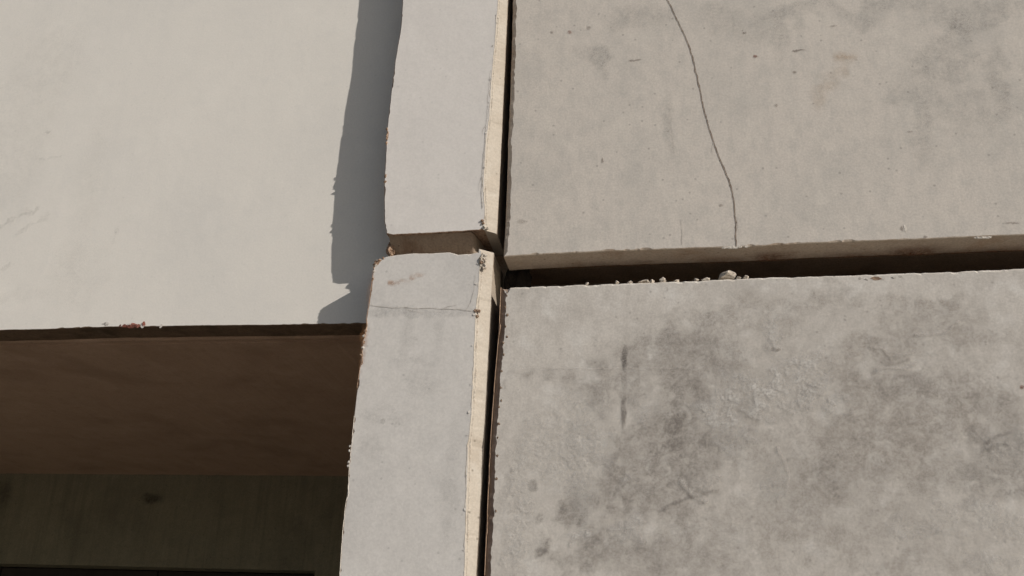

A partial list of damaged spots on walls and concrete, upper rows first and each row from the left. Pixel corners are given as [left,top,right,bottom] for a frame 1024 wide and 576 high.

crack [667,0,739,246]